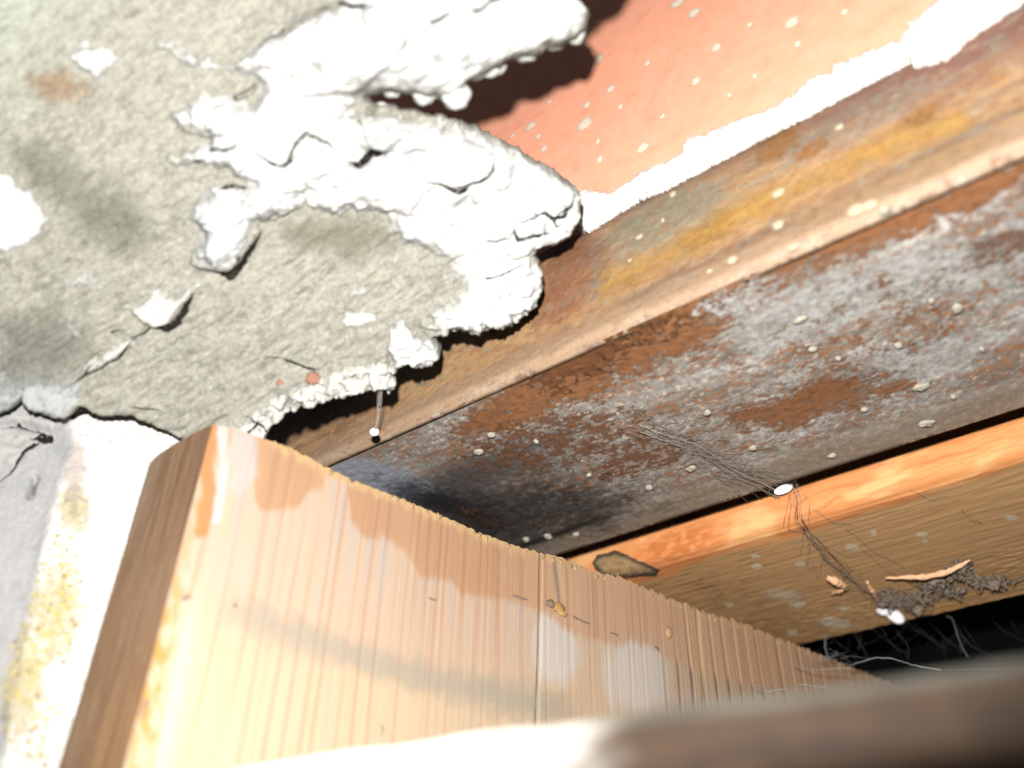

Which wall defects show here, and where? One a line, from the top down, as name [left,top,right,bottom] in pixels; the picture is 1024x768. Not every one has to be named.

rust [758,127,820,160]
rust [431,163,1024,486]
spalling [305,371,321,385]
crack [0,423,54,498]
water stain [396,483,627,538]